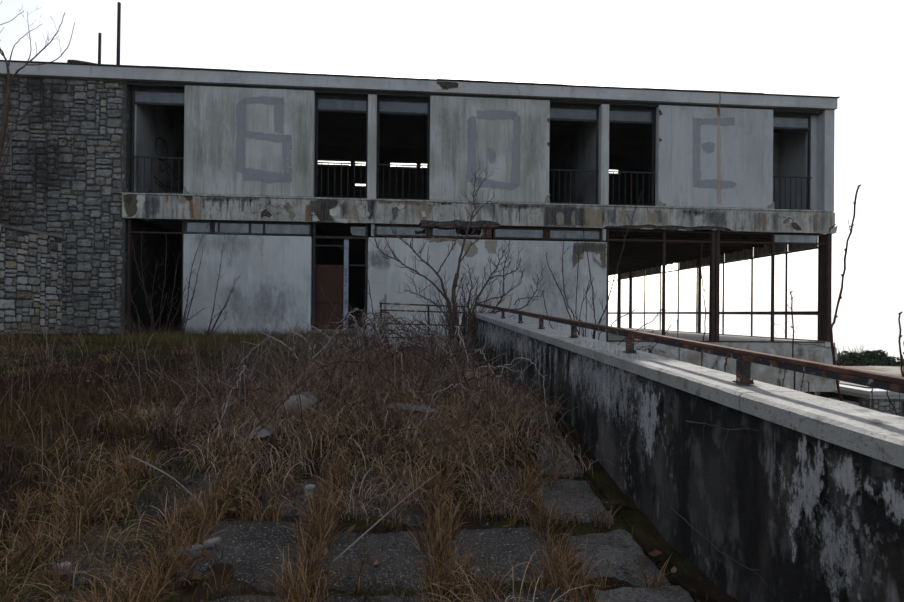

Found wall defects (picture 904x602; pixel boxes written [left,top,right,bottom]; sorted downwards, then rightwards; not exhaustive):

peeling [122,194,146,218]
peeling [310,199,348,223]
spalling [607,224,734,232]
peeling [572,242,607,269]
leakage [476,320,660,460]
leakage [778,436,904,602]